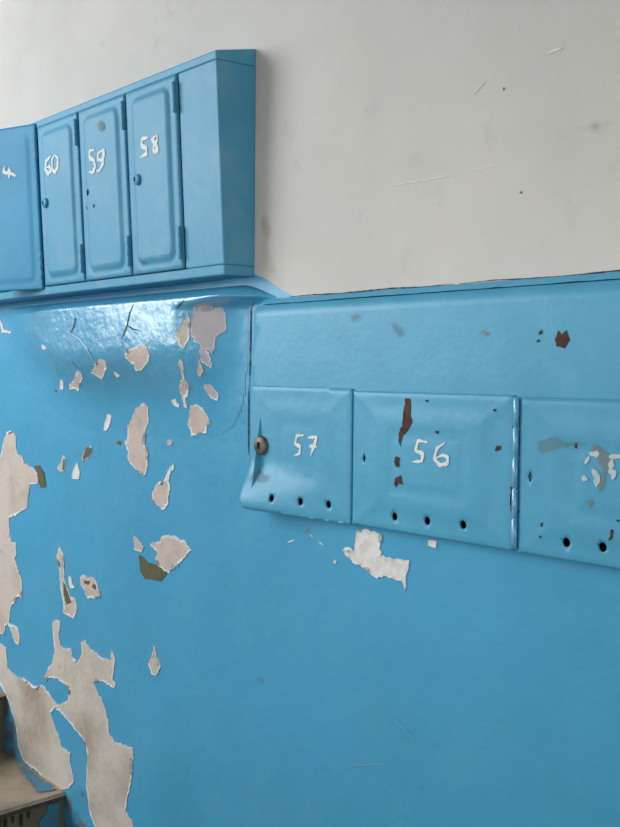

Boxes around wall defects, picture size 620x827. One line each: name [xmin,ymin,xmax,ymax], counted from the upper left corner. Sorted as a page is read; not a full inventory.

peeling [174,303,227,401]
rust [555,330,570,348]
peeling [117,403,149,476]
peeling [171,359,211,436]
rust [398,398,412,447]
peeling [150,464,175,510]
rust [394,456,403,487]
peeling [133,535,192,581]
peeling [343,529,410,591]
peeling [0,431,134,827]